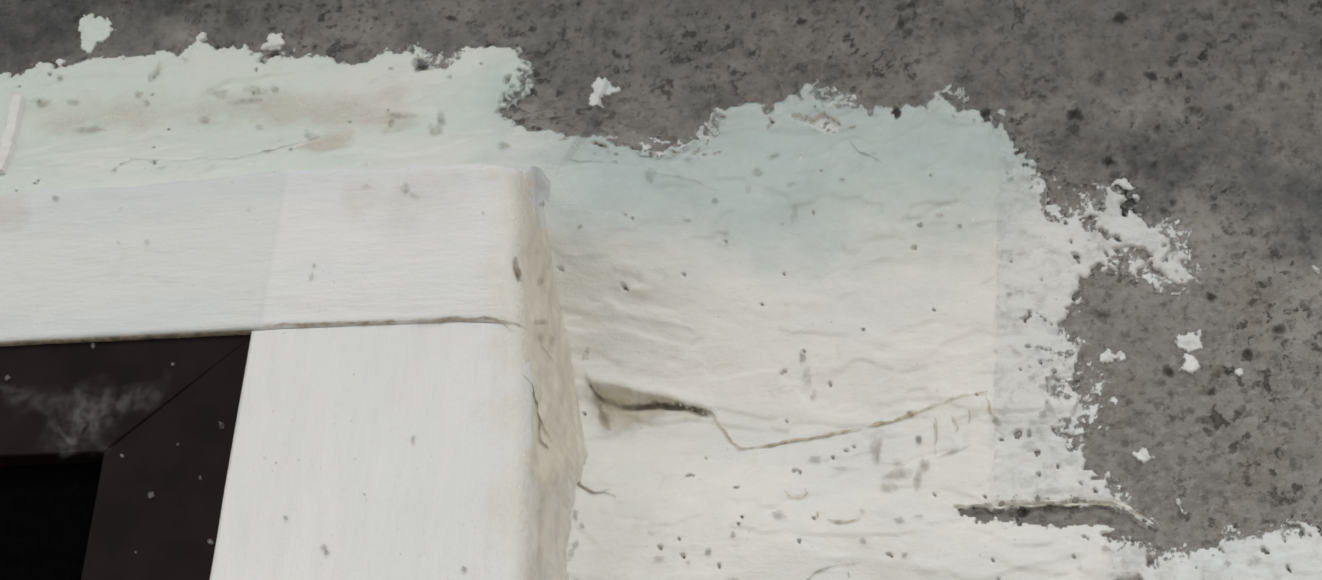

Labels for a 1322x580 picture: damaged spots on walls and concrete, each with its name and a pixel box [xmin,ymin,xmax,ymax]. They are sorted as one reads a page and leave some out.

peeling [0,31,535,193]
peeling [633,108,730,162]
peeling [788,79,886,135]
peeling [890,84,969,120]
peeling [964,107,988,123]
peeling [488,121,1322,580]
crack [701,392,991,454]